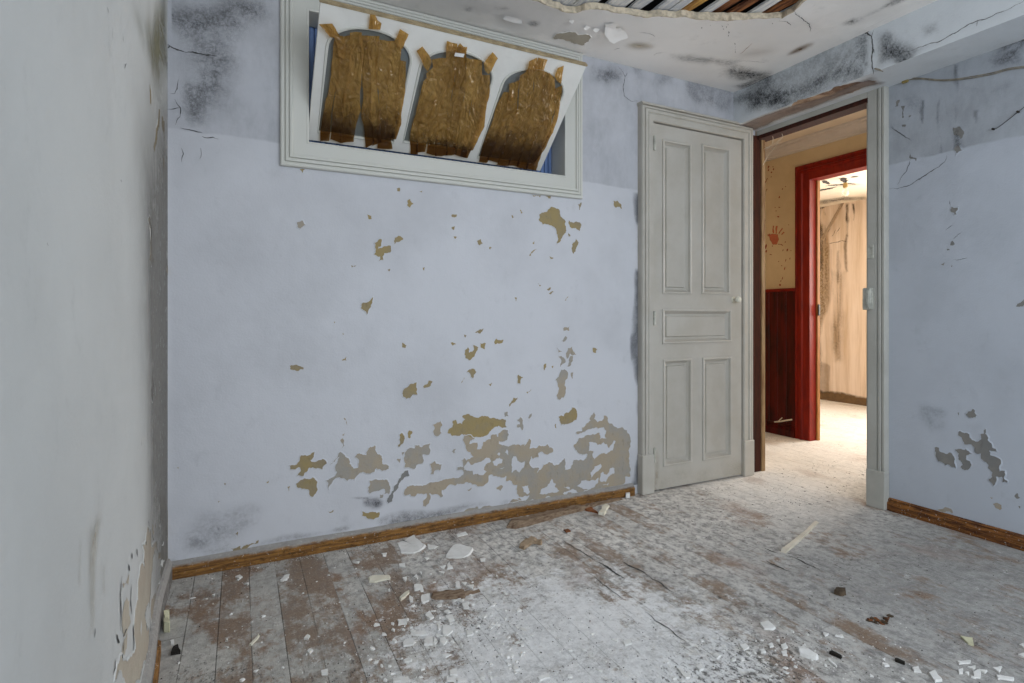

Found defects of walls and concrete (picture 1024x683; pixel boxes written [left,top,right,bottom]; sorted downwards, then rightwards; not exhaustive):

crack [168,45,214,56]
damp [150,4,256,71]
flaking render [532,0,806,46]
damp [882,39,910,62]
damp [731,70,781,106]
crack [170,83,216,161]
crack [892,128,944,189]
peeling [533,195,582,254]
peeling [288,327,632,521]
peeling [933,408,1020,510]
peeling [113,524,164,683]